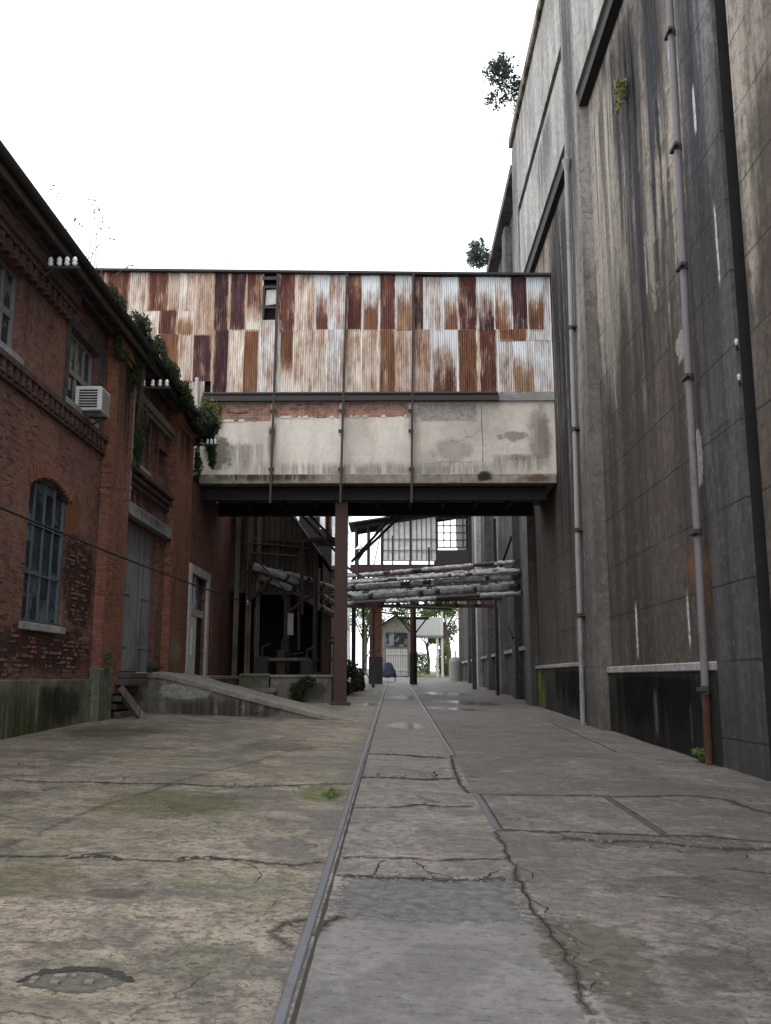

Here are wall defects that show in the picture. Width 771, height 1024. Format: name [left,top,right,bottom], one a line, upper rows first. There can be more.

leakage [682,0,703,213]
leakage [593,0,671,343]
corrosion [98,272,547,392]
leakage [204,437,460,481]
peeling [217,403,477,423]
peeling [28,973,112,985]
crack [0,829,771,1015]